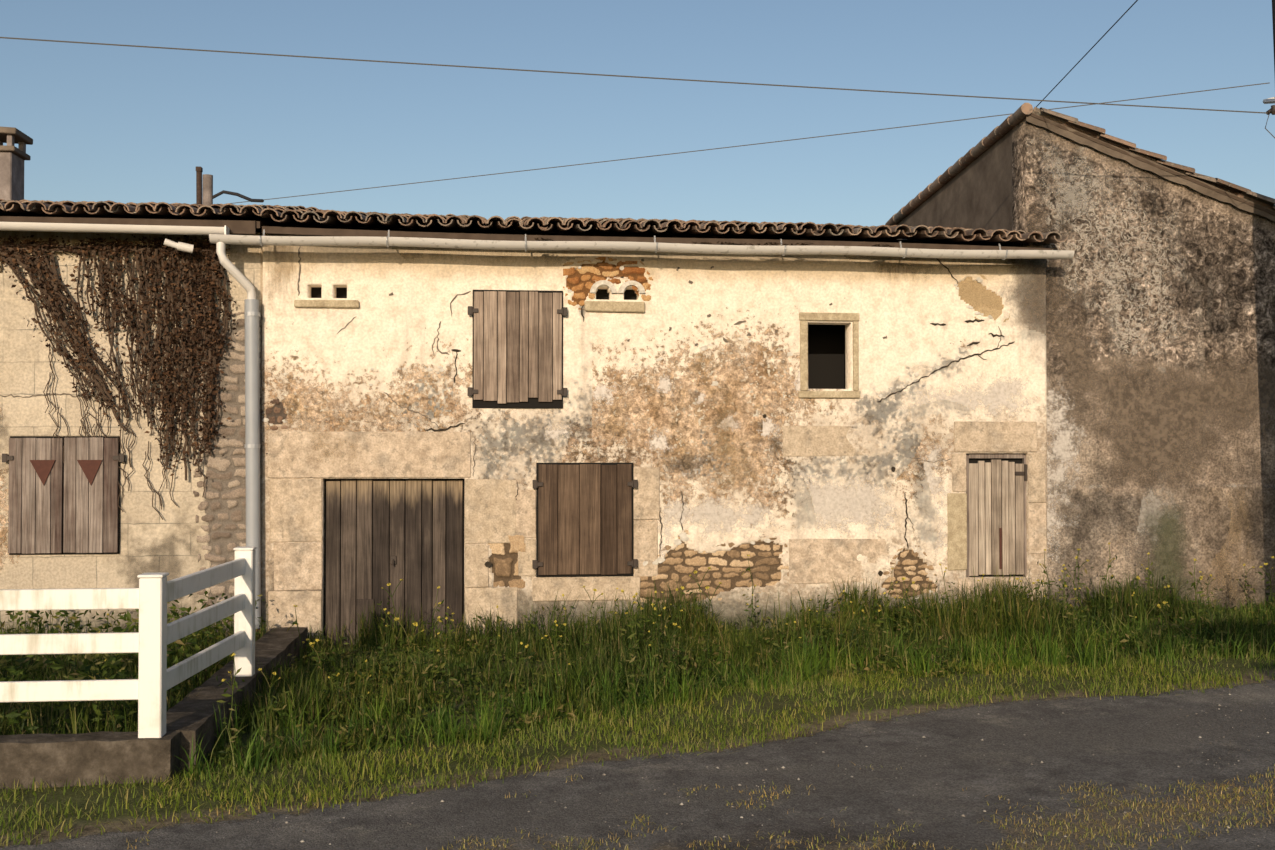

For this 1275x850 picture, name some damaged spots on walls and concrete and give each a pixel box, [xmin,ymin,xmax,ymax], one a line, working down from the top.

flaking render [563,257,653,322]
peeling [954,274,1010,348]
crack [878,326,1015,403]
peeling [544,307,848,521]
crack [904,494,914,549]